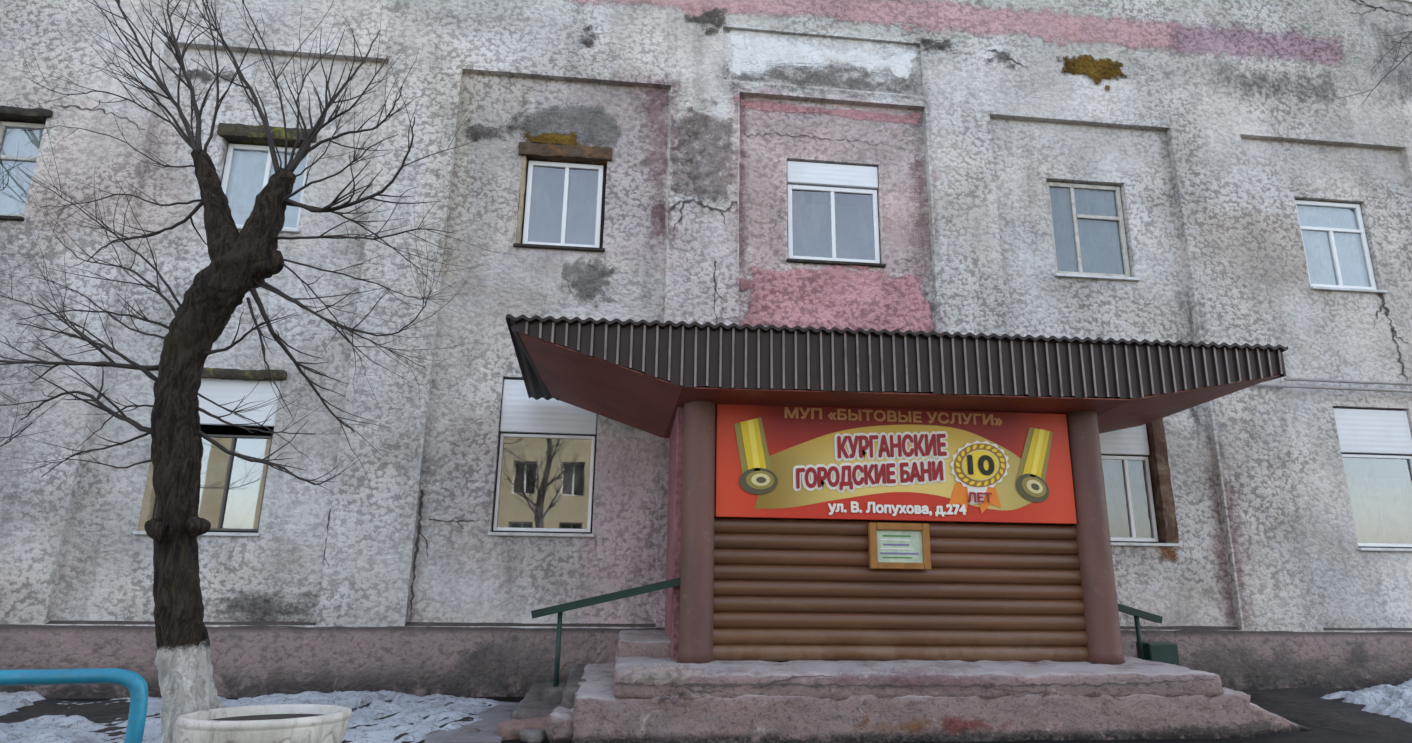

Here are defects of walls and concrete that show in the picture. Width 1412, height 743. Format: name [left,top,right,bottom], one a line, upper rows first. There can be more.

peeling [572,0,1343,91]
spalling [465,100,621,149]
spalling [665,94,921,211]
crack [1374,293,1408,381]